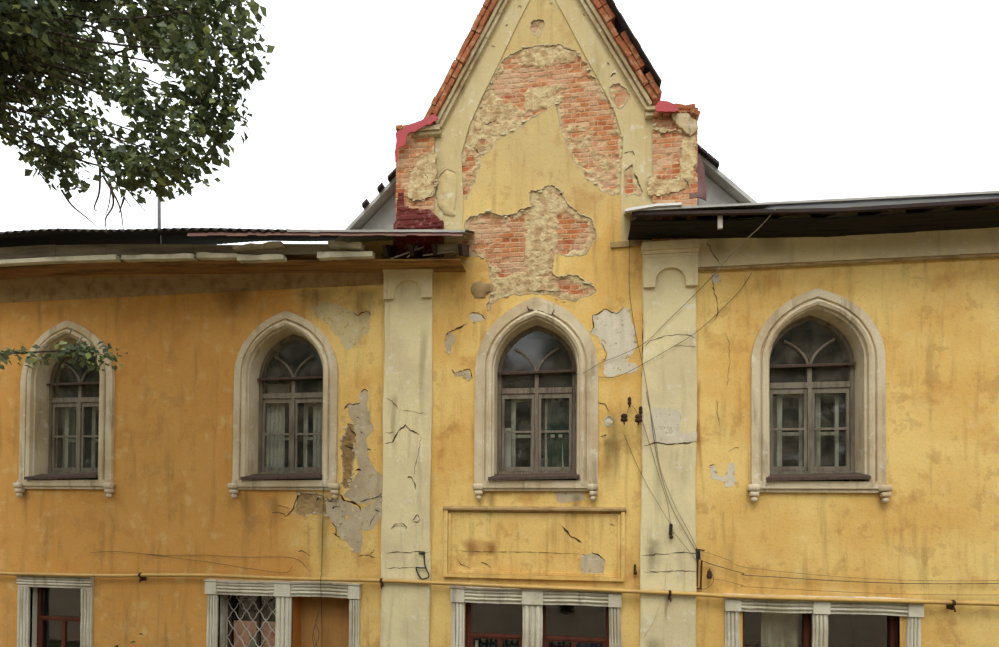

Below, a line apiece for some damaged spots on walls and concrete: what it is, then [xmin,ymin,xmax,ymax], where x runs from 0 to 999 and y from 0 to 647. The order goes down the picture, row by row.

flaking render [462,19,697,200]
flaking render [407,151,438,201]
flaking render [461,184,597,323]
peeling [313,302,371,351]
peeling [590,308,638,377]
peeling [295,390,383,554]
crack [272,389,428,569]
peeling [709,462,736,487]
peeling [580,553,605,574]